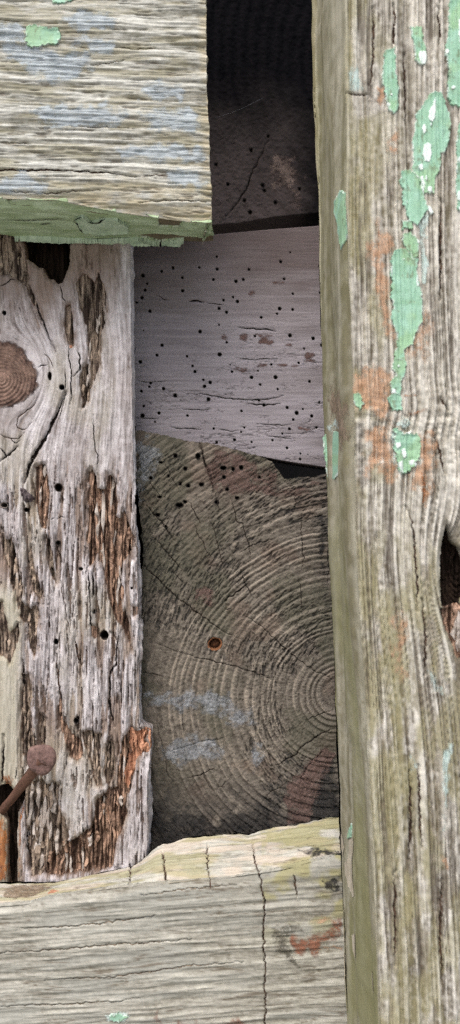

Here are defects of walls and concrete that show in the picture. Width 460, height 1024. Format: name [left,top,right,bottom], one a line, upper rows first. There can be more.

peeling [25,24,61,49]
peeling [381,47,400,114]
crack [229,143,267,214]
peeling [0,197,214,306]
peeling [334,190,348,250]
peeling [387,0,460,474]
rust [0,819,50,898]
crack [253,849,267,1024]